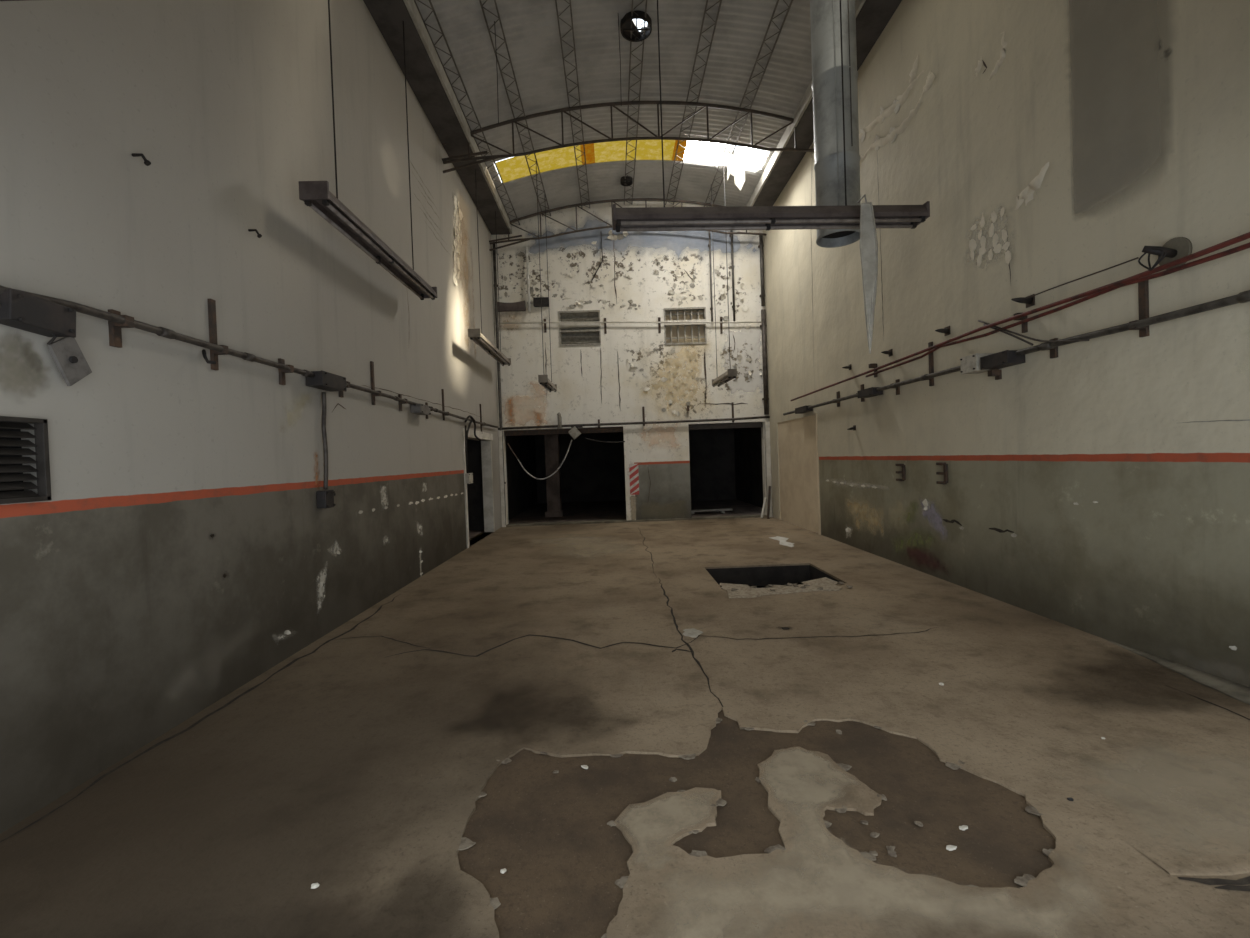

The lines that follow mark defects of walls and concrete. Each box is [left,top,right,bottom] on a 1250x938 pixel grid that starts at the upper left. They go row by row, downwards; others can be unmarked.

peeling [969,207,1011,267]
peeling [497,230,748,320]
peeling [626,344,707,417]
peeling [722,343,762,391]
spalling [318,571,326,609]
crack [1165,685,1250,720]
spalling [458,710,1056,938]
crack [1116,826,1250,891]